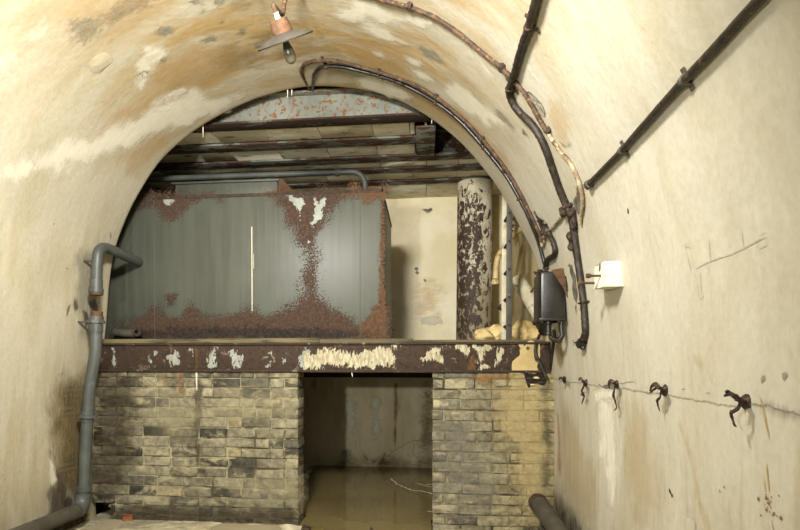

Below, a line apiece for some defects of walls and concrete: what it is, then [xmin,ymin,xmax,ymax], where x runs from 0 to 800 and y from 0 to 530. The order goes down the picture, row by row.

leakage [73,0,147,40]
corrosion [109,179,395,339]
leakage [49,386,83,513]